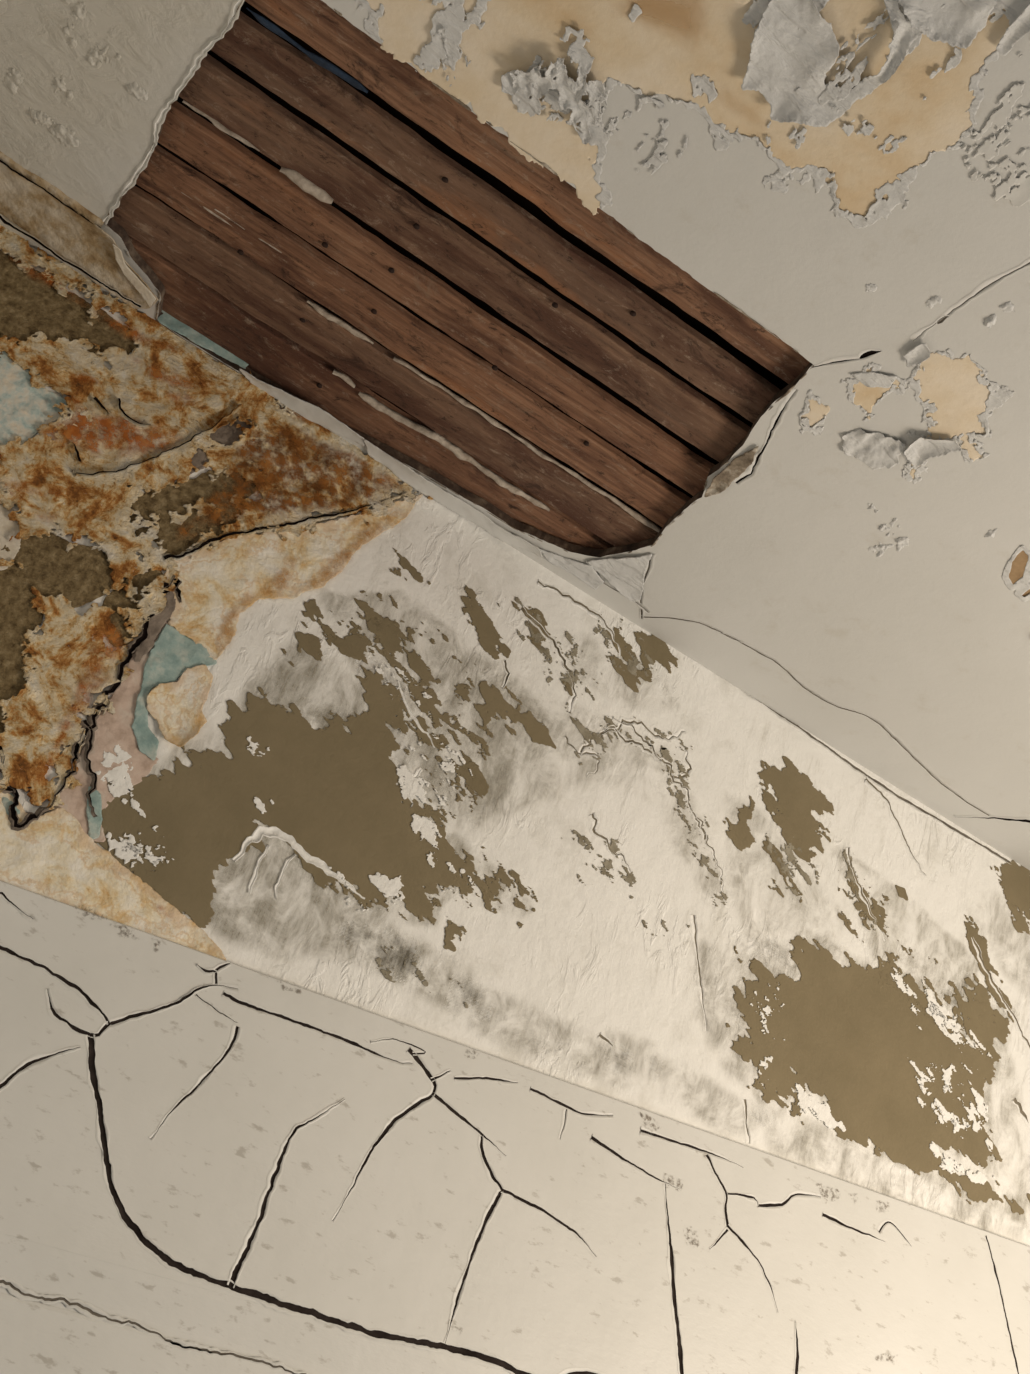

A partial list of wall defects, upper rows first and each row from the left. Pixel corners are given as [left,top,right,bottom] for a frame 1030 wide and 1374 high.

peeling [334,0,1030,229]
rust [48,400,170,452]
rust [205,412,395,524]
peeling [0,0,758,960]
peeling [768,365,830,436]
peeling [840,343,1015,484]
peeling [1002,545,1030,602]
crack [0,491,407,831]
crack [519,552,1030,895]
crack [0,890,912,1374]
crack [1012,1098,1028,1124]
crack [984,1236,1019,1374]